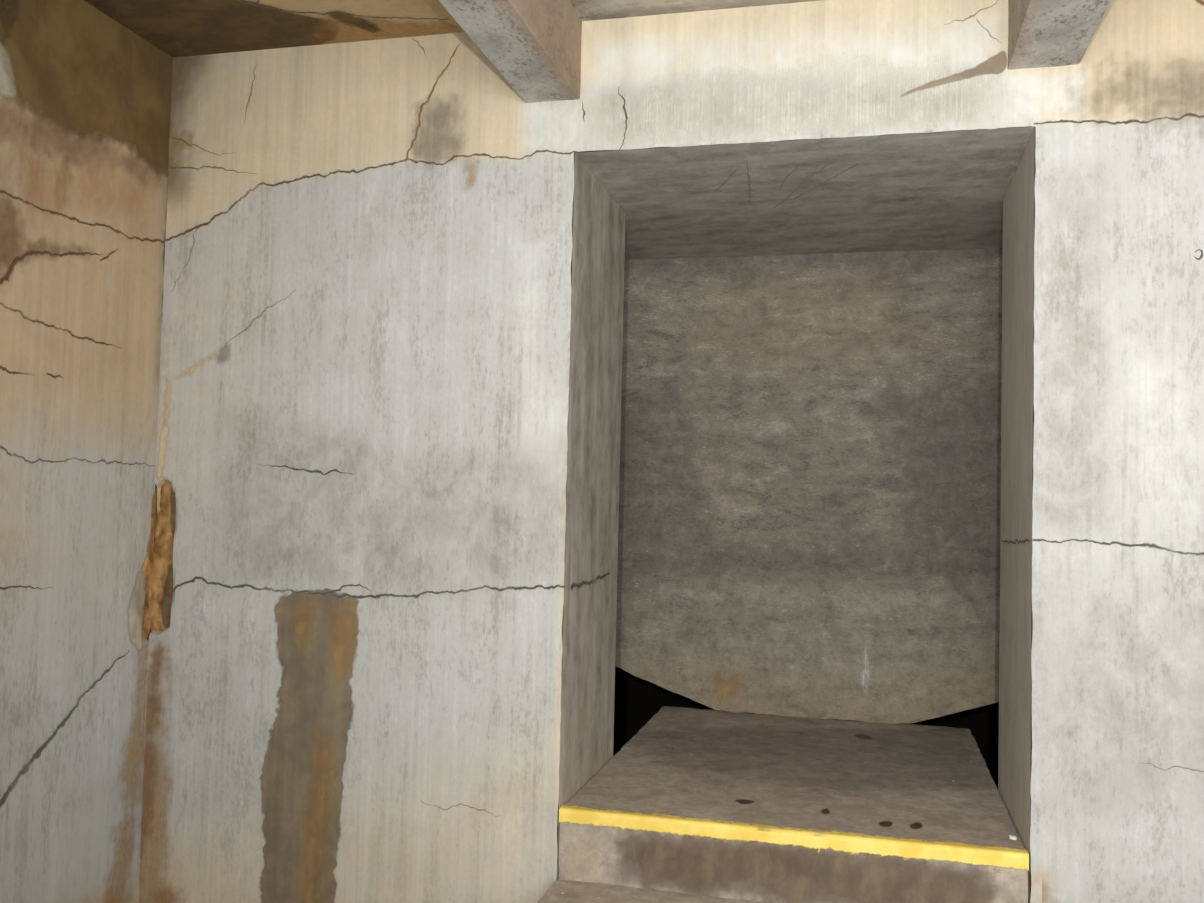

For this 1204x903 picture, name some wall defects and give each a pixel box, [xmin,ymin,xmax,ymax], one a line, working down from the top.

crack [618,89,628,150]
crack [1033,113,1204,125]
crack [0,0,580,348]
crack [0,366,62,379]
crack [0,446,155,466]
crack [1003,539,1204,555]
crack [0,583,54,591]
crack [170,573,610,599]
crack [0,650,130,807]
corrosion [117,671,166,903]